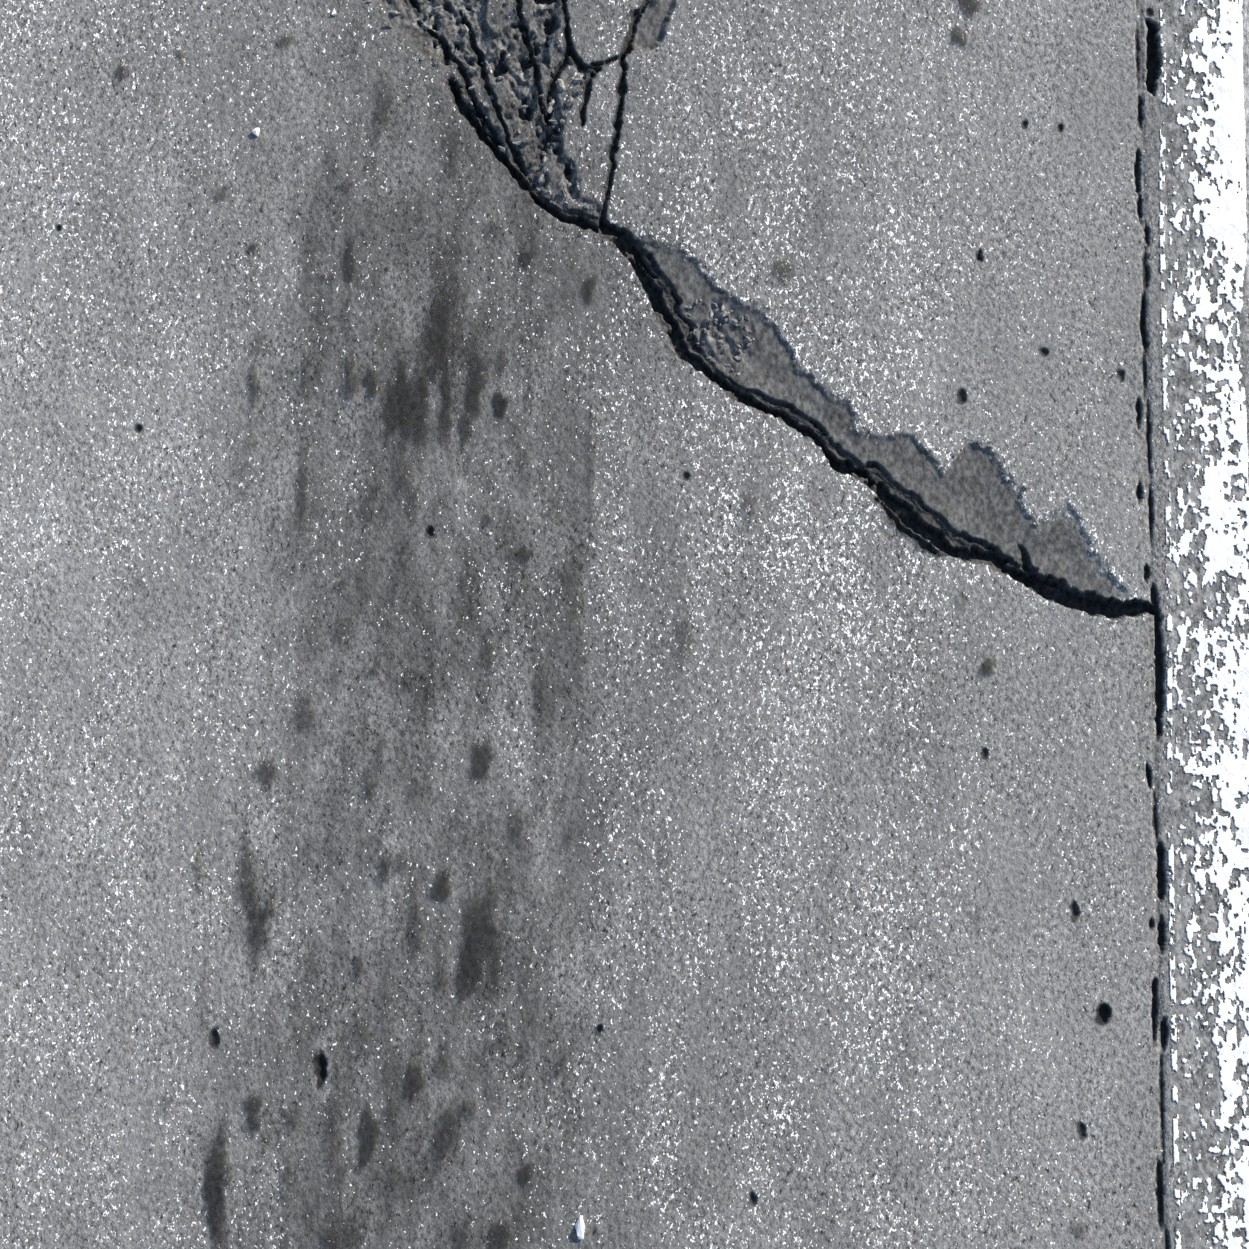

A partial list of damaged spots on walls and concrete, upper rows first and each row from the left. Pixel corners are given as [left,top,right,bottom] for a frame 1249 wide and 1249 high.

spalling [366,0,600,217]
spalling [632,0,678,51]
water stain [383,300,471,444]
spalling [636,236,1111,596]
crack [409,0,1169,1249]
peeling [1145,9,1249,1249]
water stain [205,1172,220,1237]